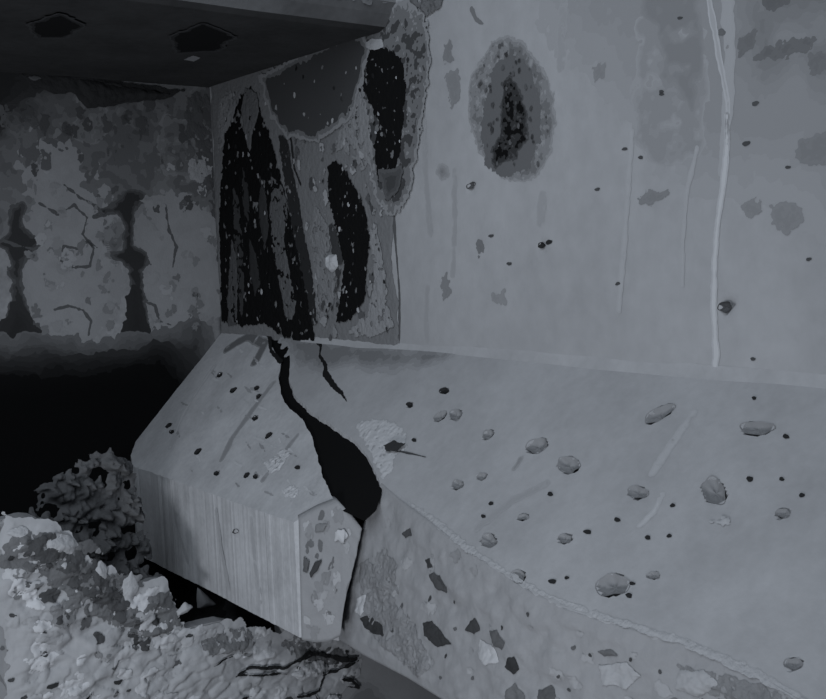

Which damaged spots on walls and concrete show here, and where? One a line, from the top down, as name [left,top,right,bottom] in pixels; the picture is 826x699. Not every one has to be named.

crack [38,184,104,269]
damp [258,0,458,301]
damp [443,35,557,182]
damp [534,0,826,367]
crack [53,304,92,336]
damp [0,72,219,531]
crack [267,336,382,521]
spalling [645,404,676,423]
damp [125,499,230,623]
spalling [0,419,798,699]
crack [214,650,360,699]
spalling [783,658,803,670]